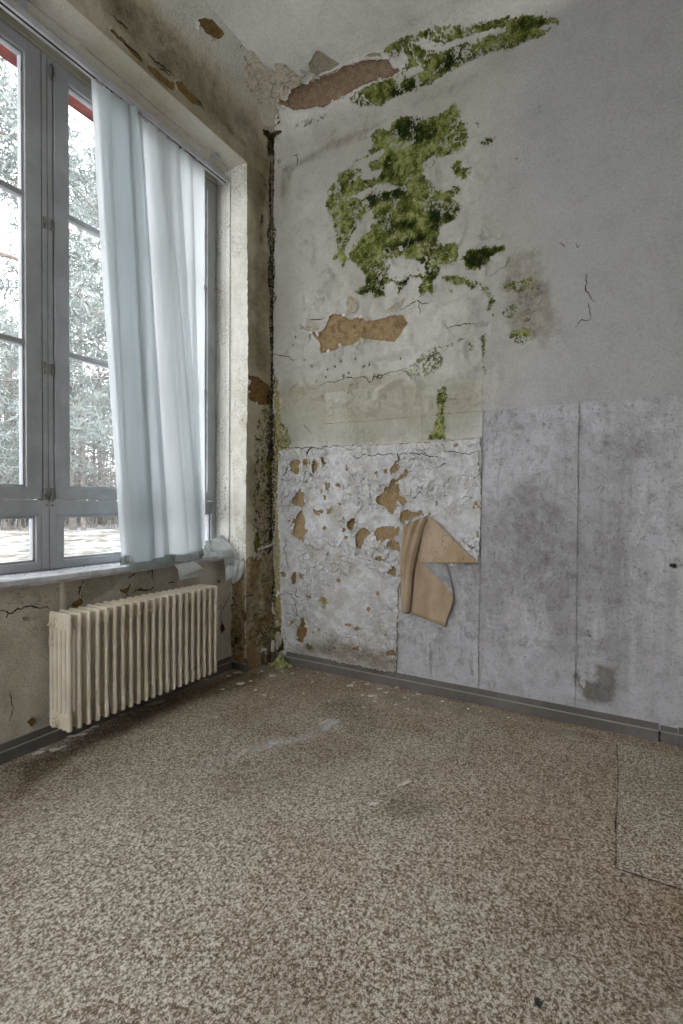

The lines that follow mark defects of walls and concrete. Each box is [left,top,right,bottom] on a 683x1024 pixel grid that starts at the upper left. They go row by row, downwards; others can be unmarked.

peeling [108,15,205,110]
flaking render [193,14,227,42]
flaking render [240,45,409,126]
peeling [230,166,272,543]
water stain [253,154,284,632]
flaking render [292,295,410,382]
crack [575,276,592,328]
peeling [229,437,482,672]
crack [1,605,48,618]
water stain [578,667,615,702]